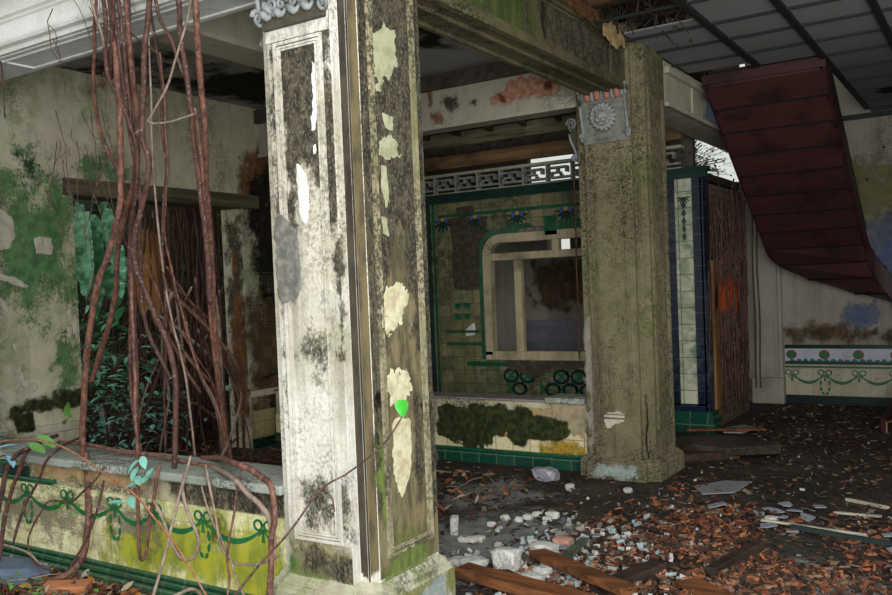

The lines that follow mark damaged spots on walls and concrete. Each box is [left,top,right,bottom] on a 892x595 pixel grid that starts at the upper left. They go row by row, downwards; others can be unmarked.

spalling [560,0,625,50]
peeling [491,74,559,107]
leakage [12,134,50,185]
peeling [0,209,15,250]
leakage [223,10,347,429]
peeling [0,273,29,288]
spalling [274,215,301,304]
peeling [382,282,409,337]
leakage [784,320,892,345]
peeling [387,367,413,407]
peeling [392,417,412,497]
leakage [167,481,284,540]